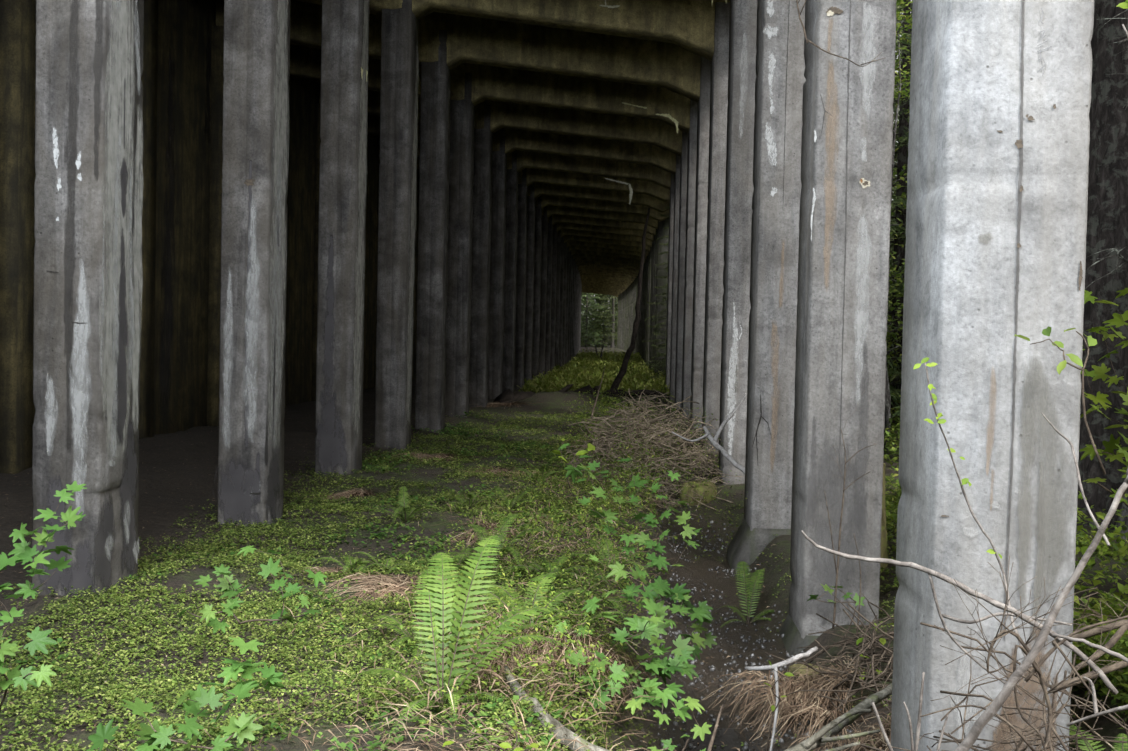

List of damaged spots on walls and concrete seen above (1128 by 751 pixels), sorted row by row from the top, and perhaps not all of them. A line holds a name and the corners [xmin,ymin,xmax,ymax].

leakage [765,0,777,37]
leakage [766,54,777,165]
leakage [1014,369,1066,637]